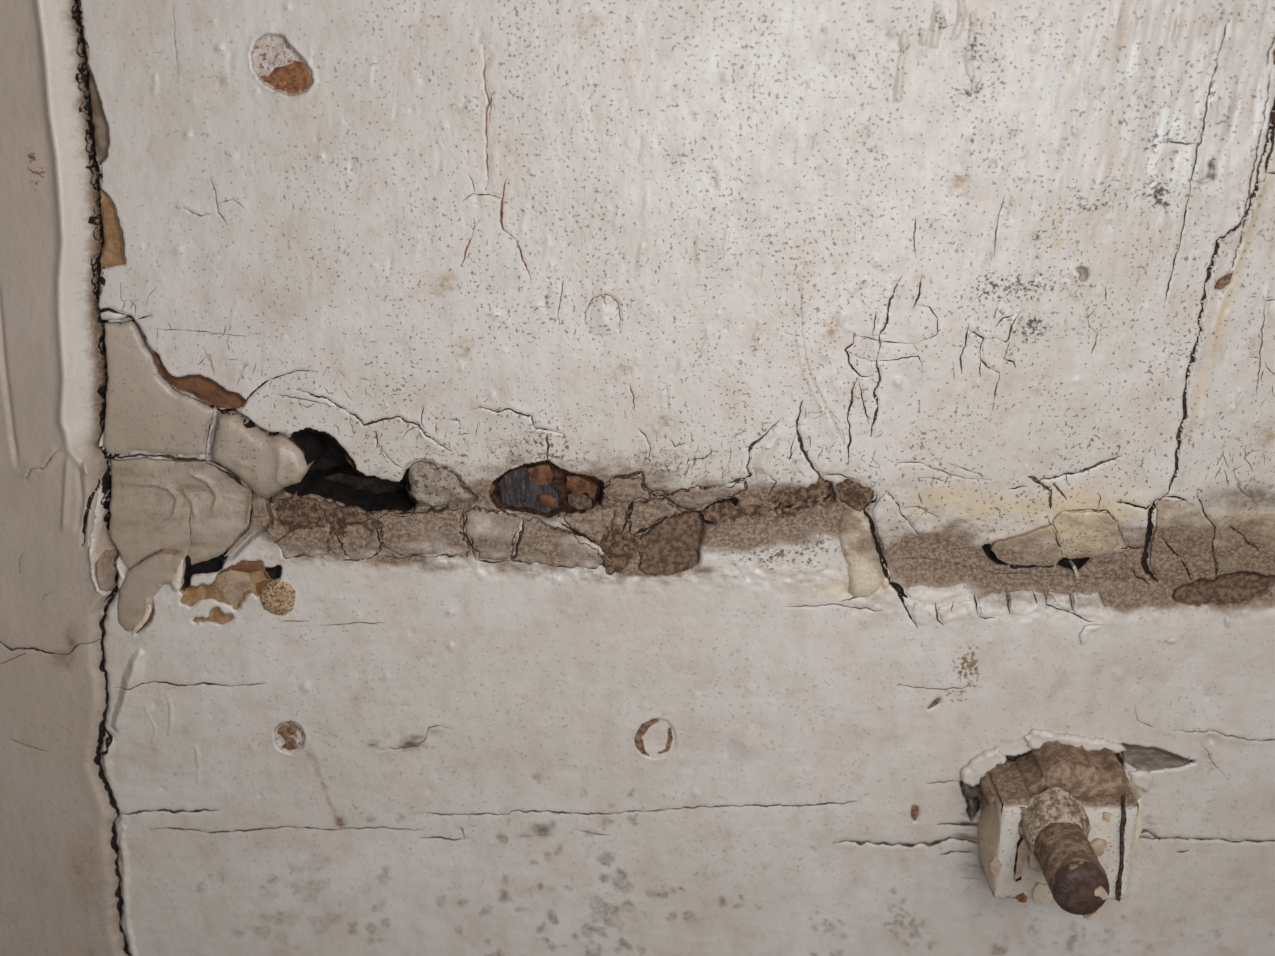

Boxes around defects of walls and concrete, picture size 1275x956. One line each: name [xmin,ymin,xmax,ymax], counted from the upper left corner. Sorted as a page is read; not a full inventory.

crack [560,16,1275,628]
peeling [154,351,246,409]
crack [0,0,858,956]
spalling [776,480,835,515]
peeling [637,497,738,576]
peeling [170,551,274,624]
peeling [907,582,1104,645]
peeling [1172,571,1275,606]
crack [1183,730,1275,778]
crack [834,823,980,880]
crack [1014,837,1023,882]
crack [1115,795,1275,902]